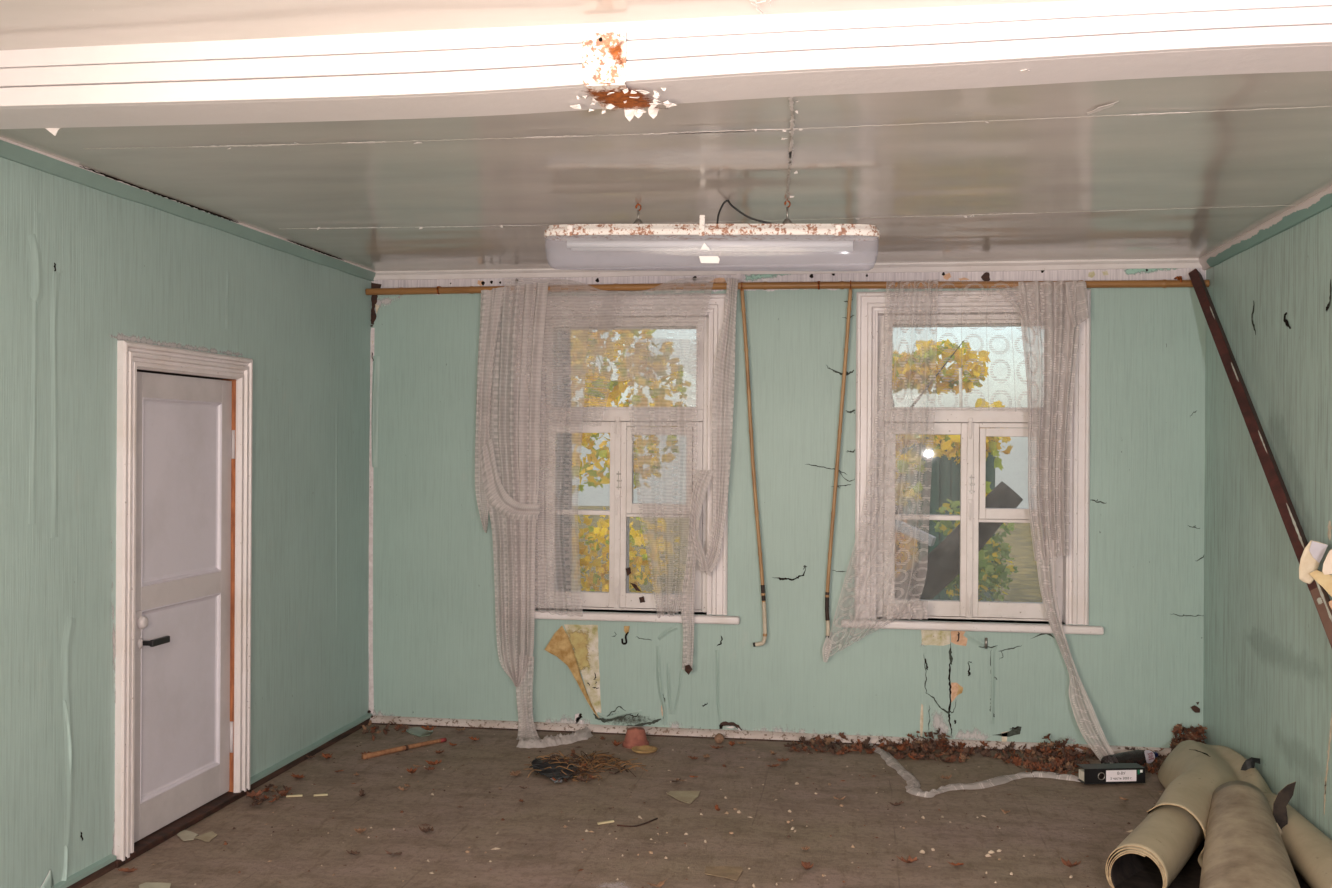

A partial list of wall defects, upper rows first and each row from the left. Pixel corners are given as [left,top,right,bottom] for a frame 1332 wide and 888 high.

peeling [570,88,677,122]
crack [773,565,807,581]
peeling [545,624,601,724]
crack [924,643,1022,735]